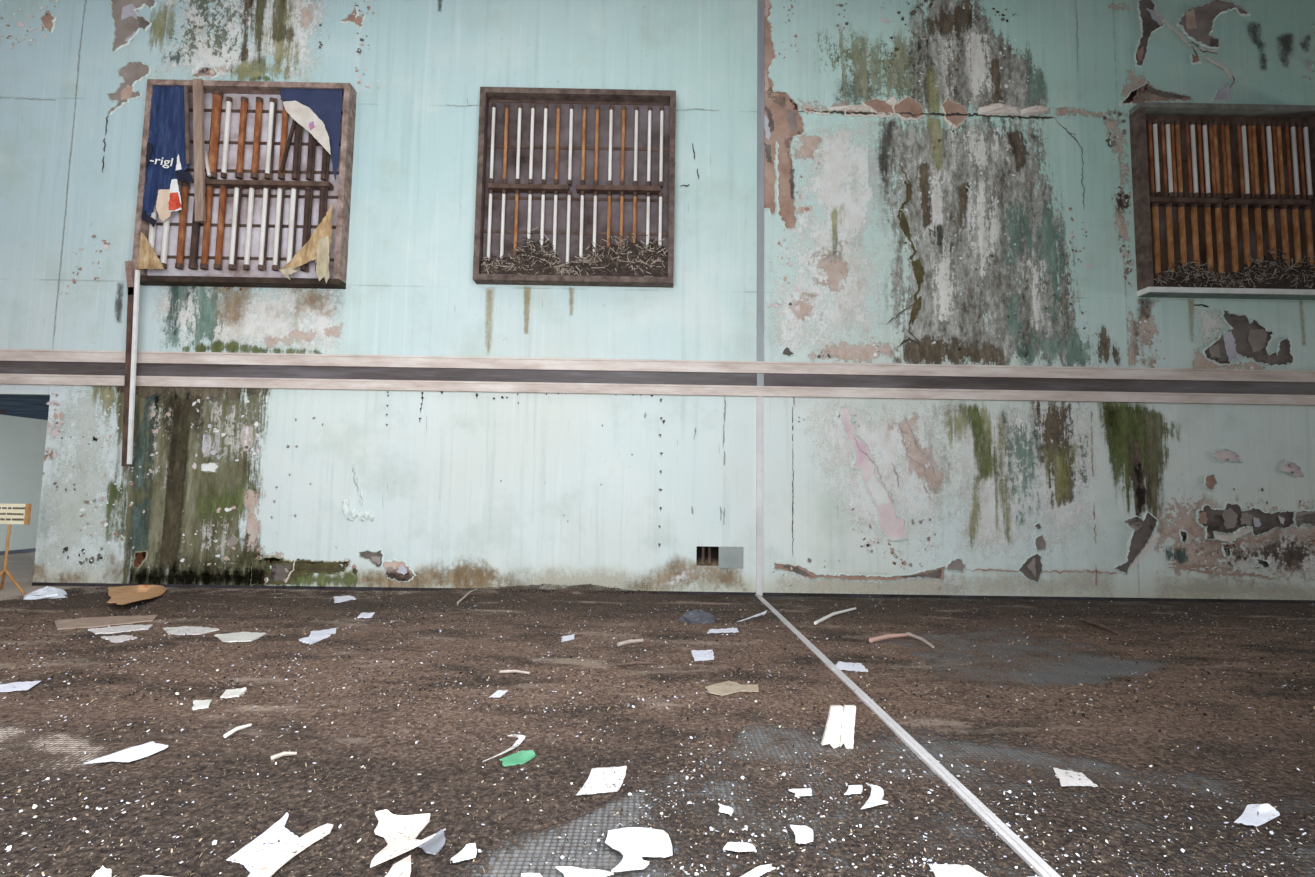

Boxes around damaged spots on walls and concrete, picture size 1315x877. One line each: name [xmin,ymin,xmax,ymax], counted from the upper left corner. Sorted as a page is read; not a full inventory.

peeling [107,0,157,116]
damp [149,0,325,81]
peeling [878,0,952,68]
peeling [764,0,911,363]
damp [818,0,1120,367]
peeling [1193,310,1294,370]
damp [93,386,270,586]
peeling [773,404,966,669]
damp [948,401,1078,544]
peeling [1113,448,1315,581]
spalling [0,489,1315,877]